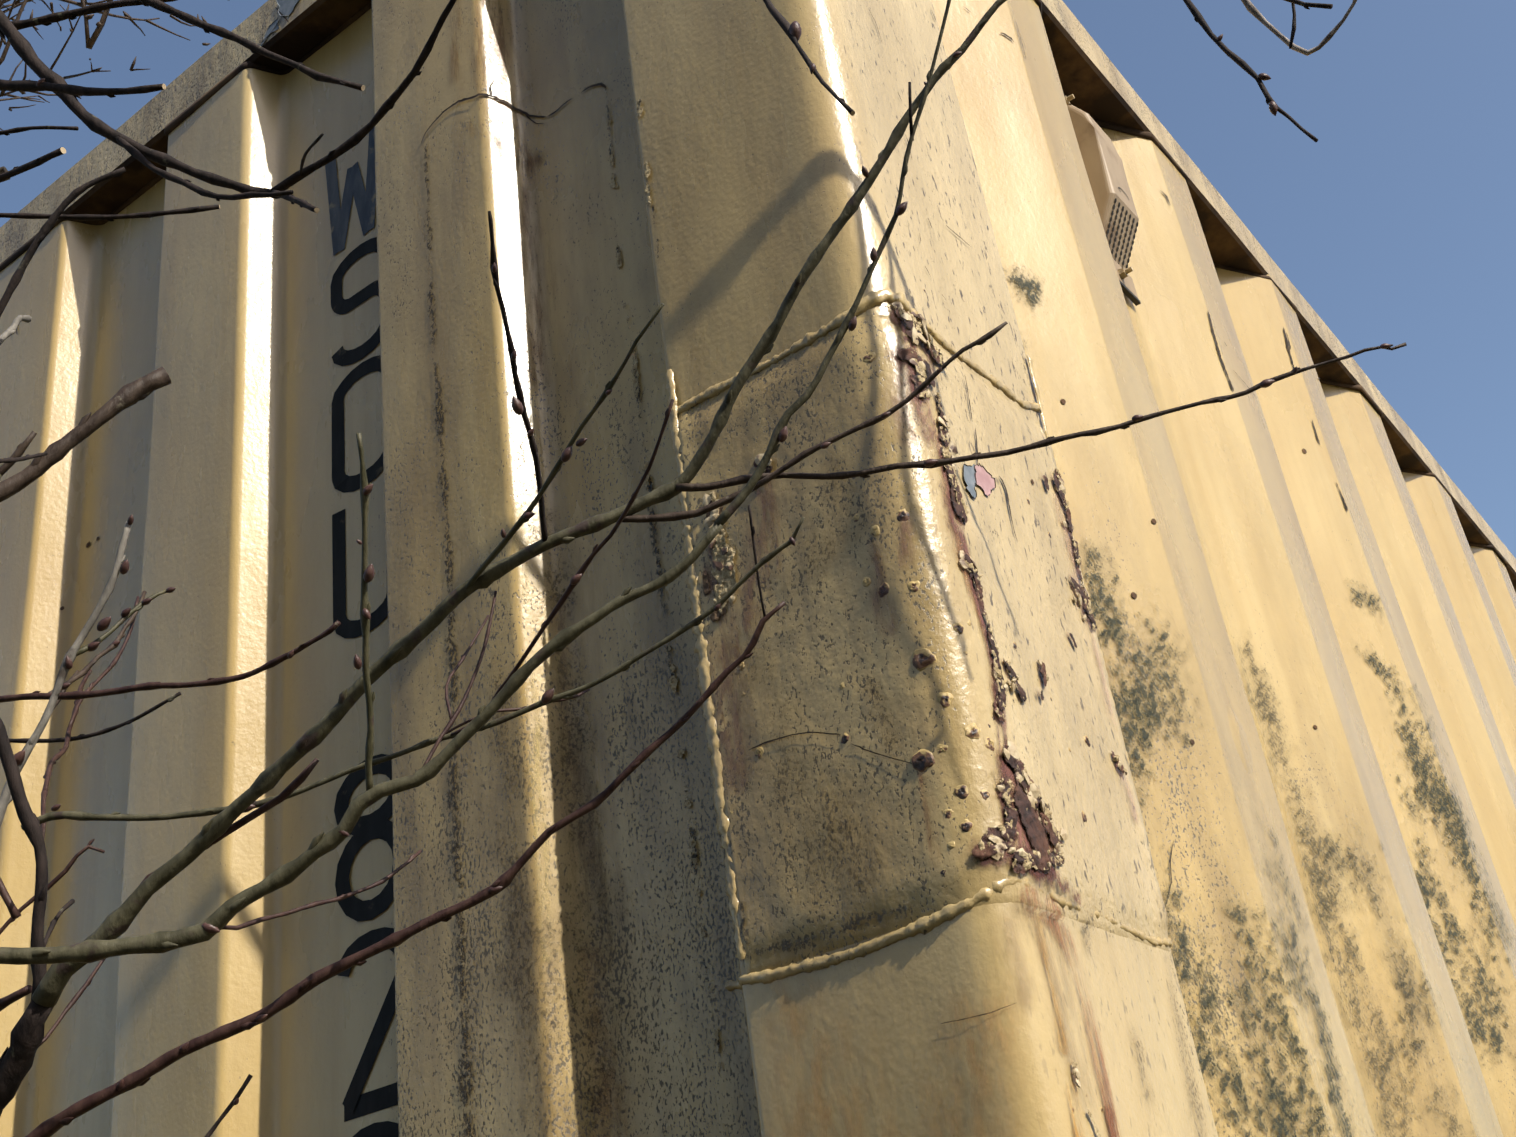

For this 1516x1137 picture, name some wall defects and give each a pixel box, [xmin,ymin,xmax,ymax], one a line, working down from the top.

crack [421,81,606,143]
damp [424,144,454,593]
rust [862,301,1081,1052]
peeling [963,463,996,498]
damp [1085,543,1198,806]
damp [1244,643,1287,771]
damp [1351,586,1382,612]
damp [446,738,474,1137]
damp [498,846,557,1061]
rust [1070,1006,1119,1137]
damp [1163,784,1463,1137]
damp [1356,646,1516,1065]